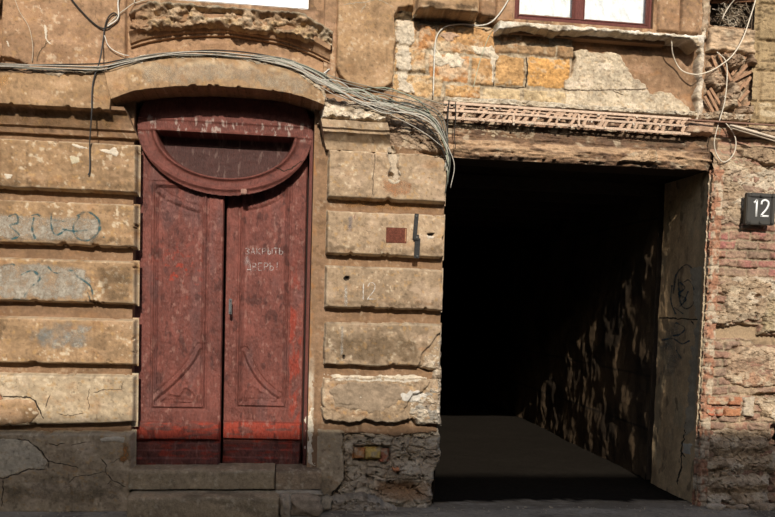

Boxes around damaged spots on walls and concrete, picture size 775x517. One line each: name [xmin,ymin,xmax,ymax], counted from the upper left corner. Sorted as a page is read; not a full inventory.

flaking render [390,0,758,126]
flaking render [448,122,568,141]
spalling [682,266,775,454]
crack [3,381,124,419]
spalling [275,330,442,517]
crack [0,438,125,507]
spalling [705,428,775,506]